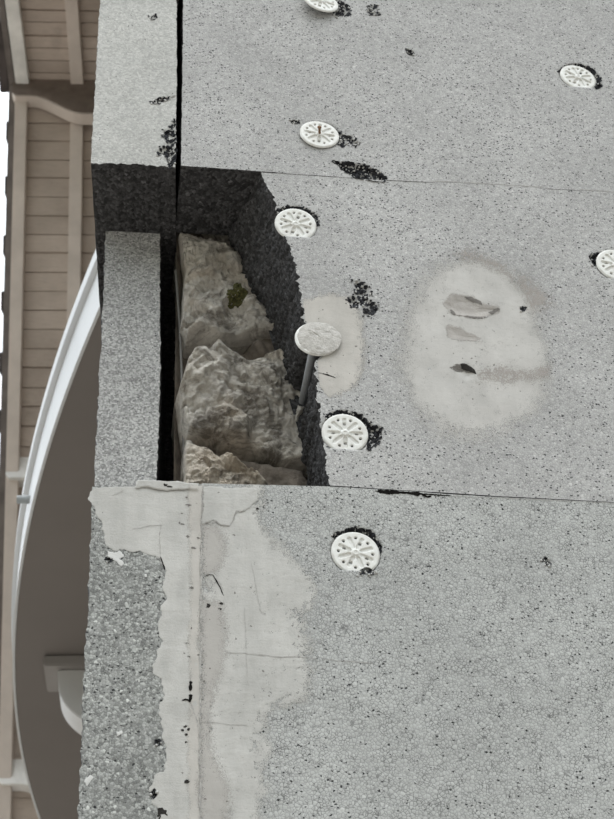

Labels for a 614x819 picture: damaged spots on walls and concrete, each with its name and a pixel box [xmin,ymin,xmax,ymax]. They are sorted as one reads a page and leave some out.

spalling [276,205,320,226]